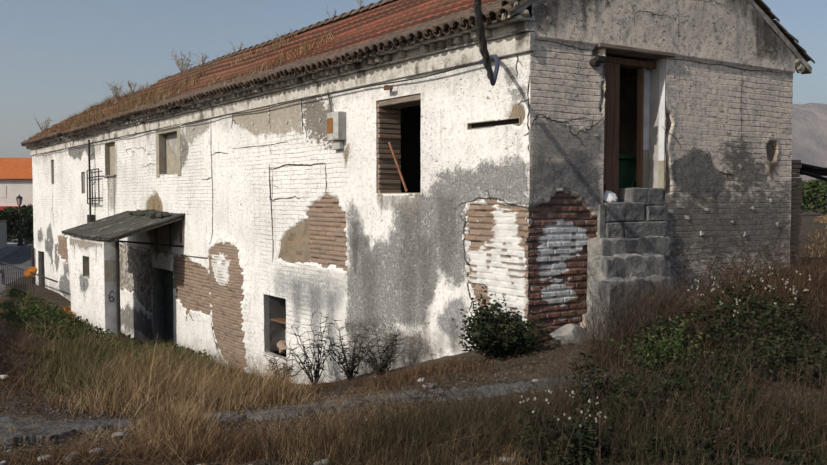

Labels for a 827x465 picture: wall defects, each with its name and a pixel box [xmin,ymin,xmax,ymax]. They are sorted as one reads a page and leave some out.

water stain [745,0,786,60]
peeling [232,94,336,153]
spalling [504,66,526,126]
crack [516,54,605,151]
water stain [668,149,725,199]
flaking render [119,244,153,340]
flaking render [173,253,212,317]
flaking render [278,194,348,271]
water stain [276,150,602,376]
flaking render [464,188,597,343]